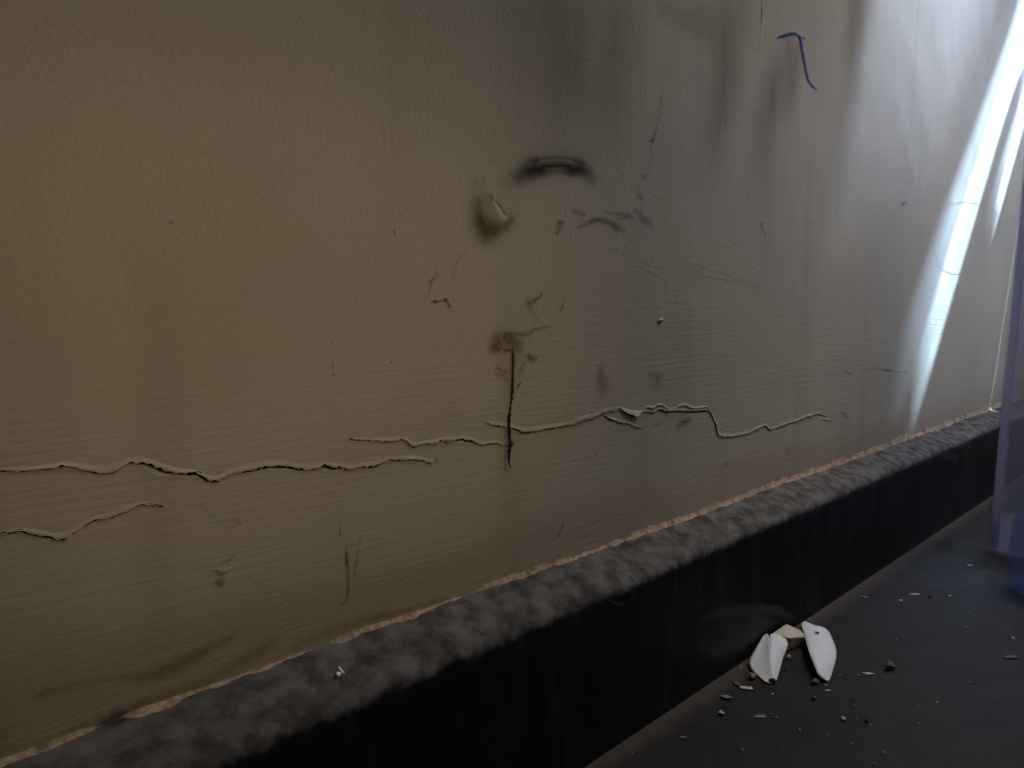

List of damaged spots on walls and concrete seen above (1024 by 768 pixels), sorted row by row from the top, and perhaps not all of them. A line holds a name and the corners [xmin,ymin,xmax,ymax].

crack [0,351,846,482]
crack [0,501,164,541]